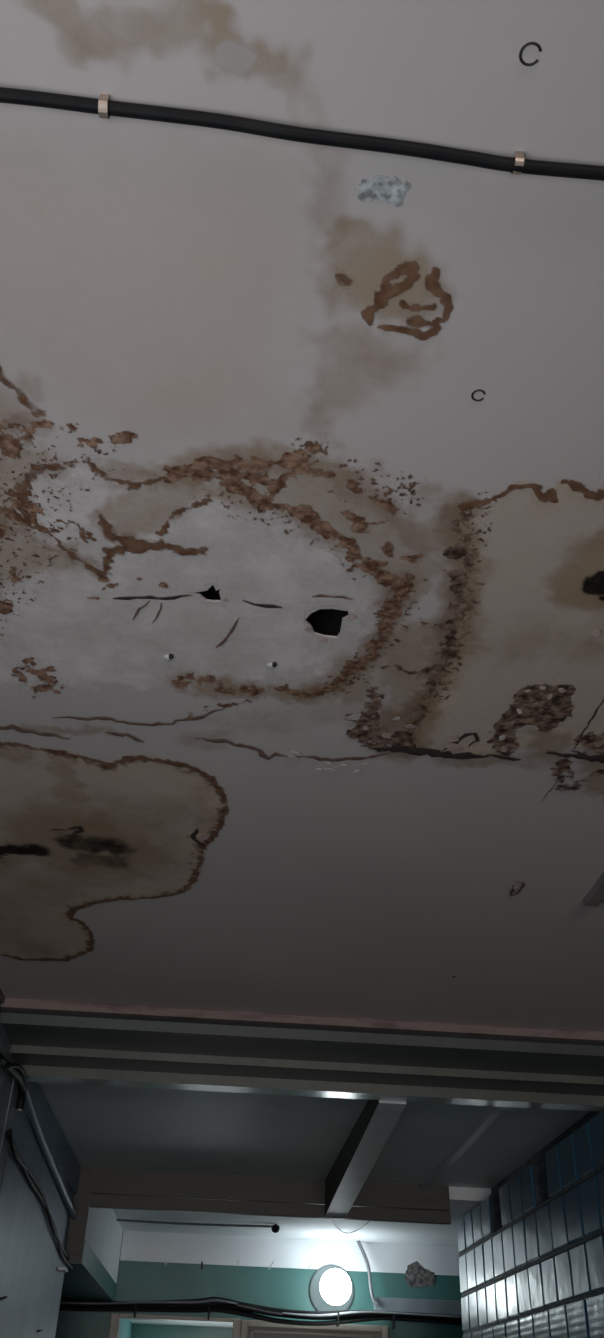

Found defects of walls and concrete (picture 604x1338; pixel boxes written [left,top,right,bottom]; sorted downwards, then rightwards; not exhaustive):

peeling [0,420,493,757]
water stain [458,479,604,608]
water stain [415,621,467,746]
water stain [440,743,501,755]
peeling [487,684,576,757]
peeling [550,732,604,792]
water stain [0,742,228,962]
spalling [405,1261,435,1288]